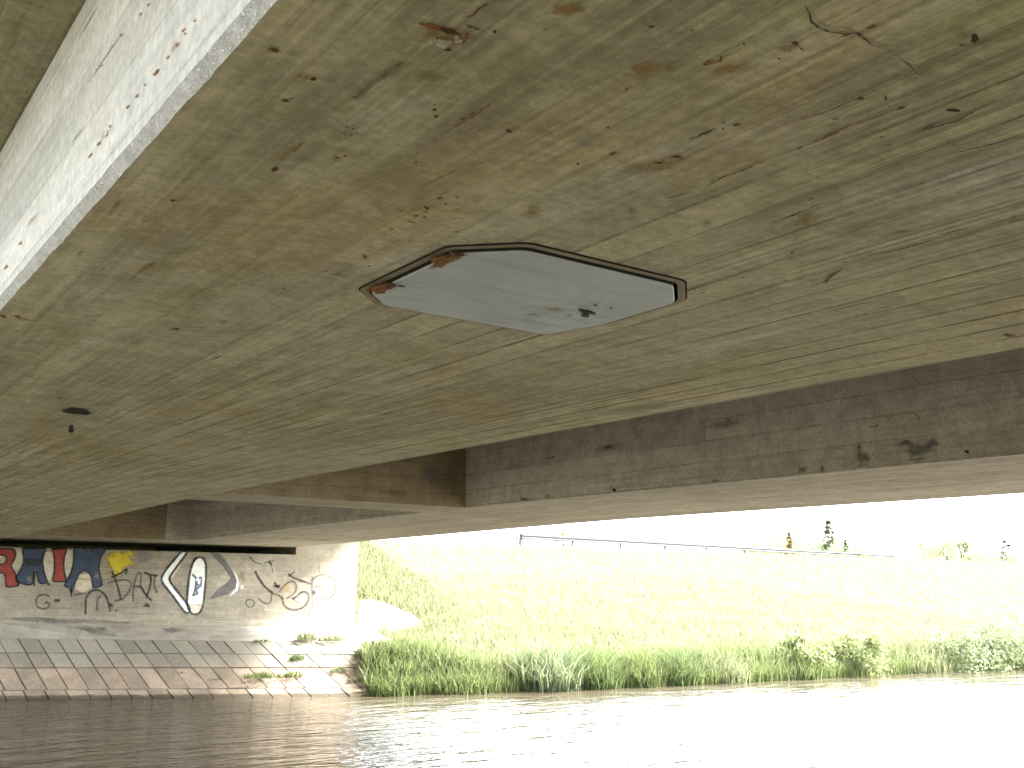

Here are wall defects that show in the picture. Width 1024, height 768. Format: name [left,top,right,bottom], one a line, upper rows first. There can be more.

spalling [419,23,468,51]
crack [804,3,941,75]
corrosion [429,252,468,269]
corrosion [366,282,405,295]
damp [900,440,937,456]